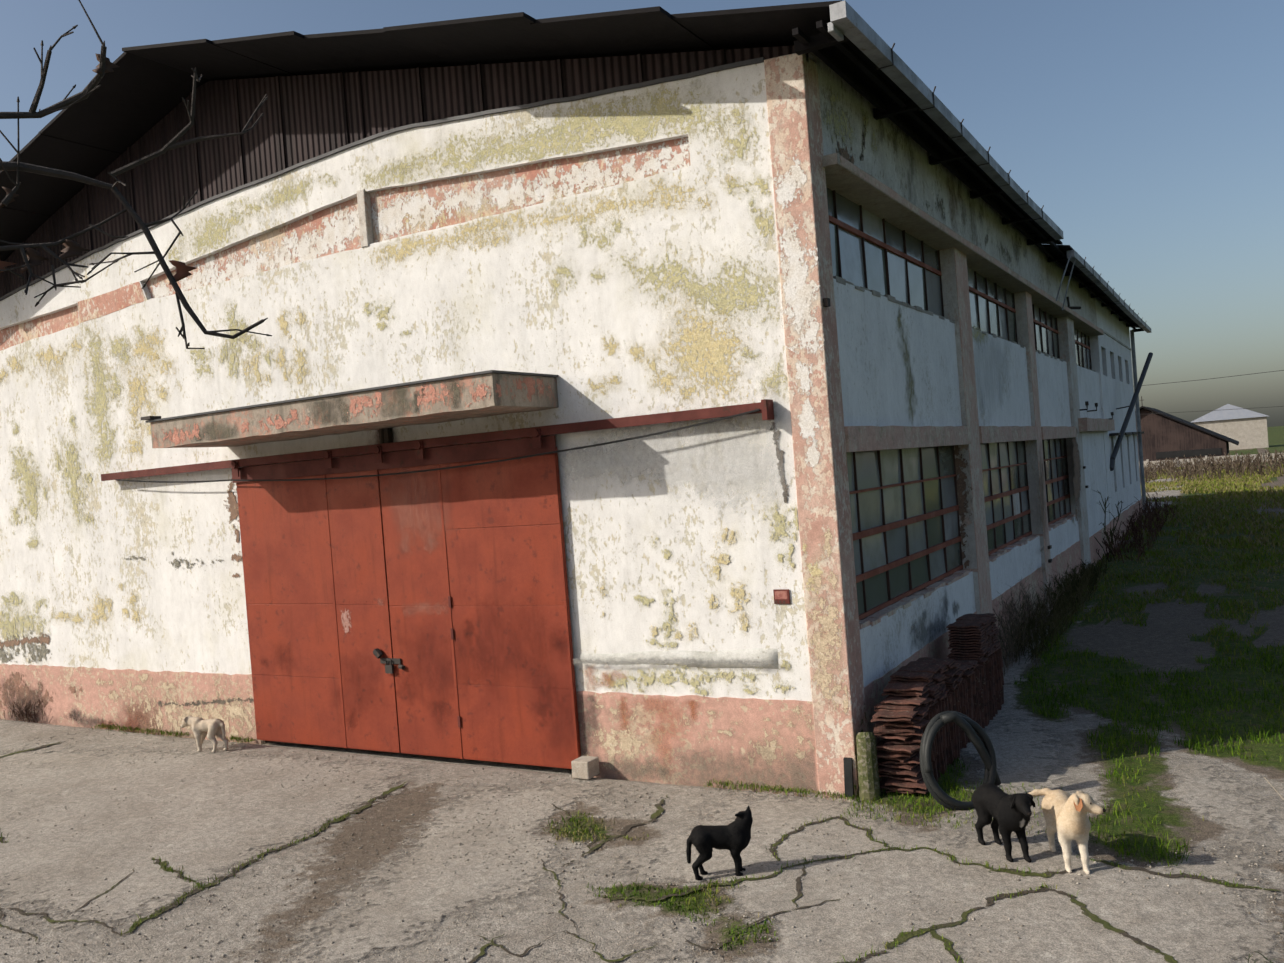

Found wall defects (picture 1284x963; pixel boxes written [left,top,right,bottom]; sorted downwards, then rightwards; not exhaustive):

peeling [152,81,824,472]
peeling [0,303,310,549]
water stain [898,312,914,417]
flaking render [166,482,242,578]
flaking render [0,583,268,745]